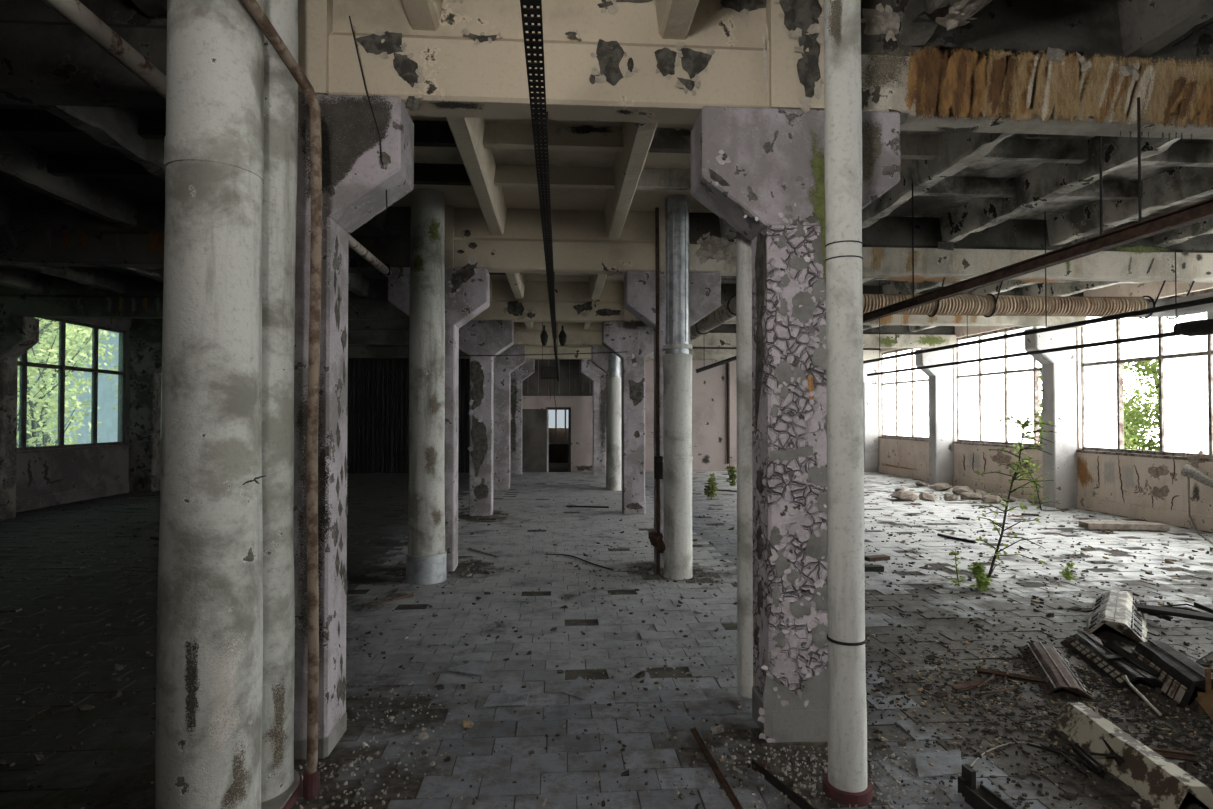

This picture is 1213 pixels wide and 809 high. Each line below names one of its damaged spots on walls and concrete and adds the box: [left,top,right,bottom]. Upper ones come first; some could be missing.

spalling [356,29,484,131]
peeling [461,28,501,45]
spalling [589,39,639,86]
peeling [597,0,655,15]
spalling [654,42,715,96]
spalling [711,0,843,113]
spalling [861,3,900,41]
spalling [935,0,992,31]
spalling [1046,47,1092,72]
spalling [1118,62,1140,81]
peeling [467,360,489,500]
damp [184,616,248,787]